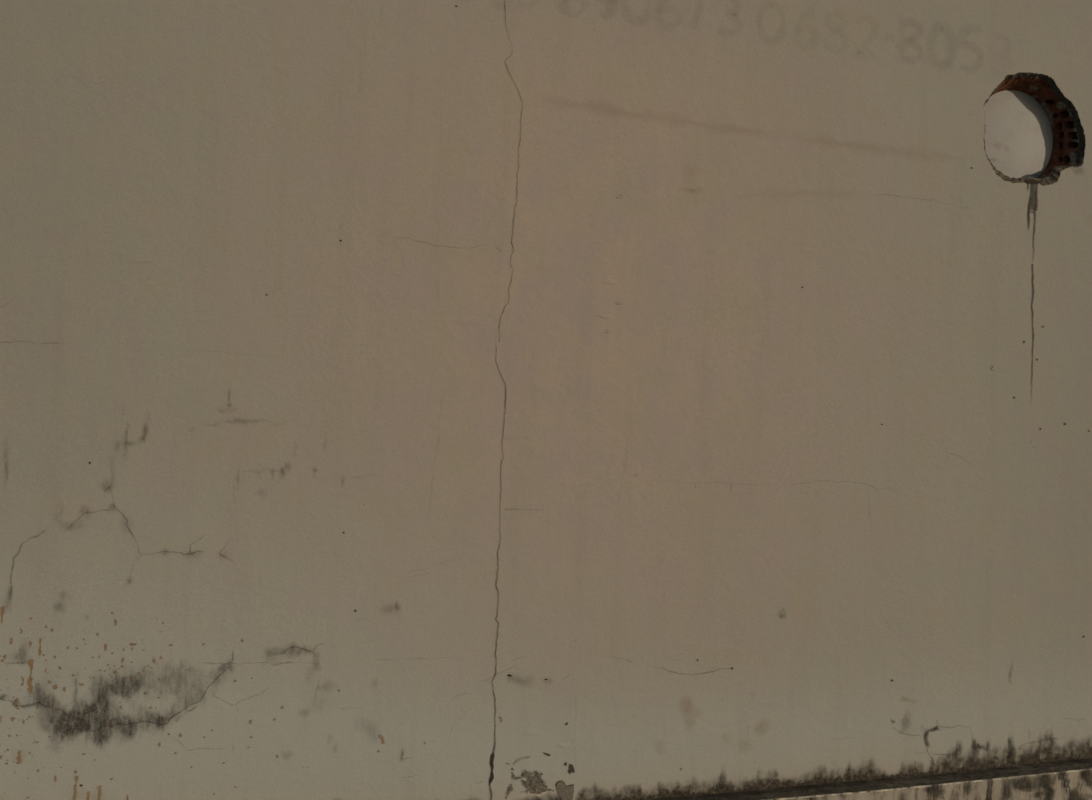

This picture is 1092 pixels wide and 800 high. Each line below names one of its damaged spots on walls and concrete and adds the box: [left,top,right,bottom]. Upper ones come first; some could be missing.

spalling [983,72,1086,186]
rust [0,617,66,764]
water stain [36,679,169,744]
crack [489,533,501,800]
peeling [506,762,575,800]
water stain [577,739,1092,800]